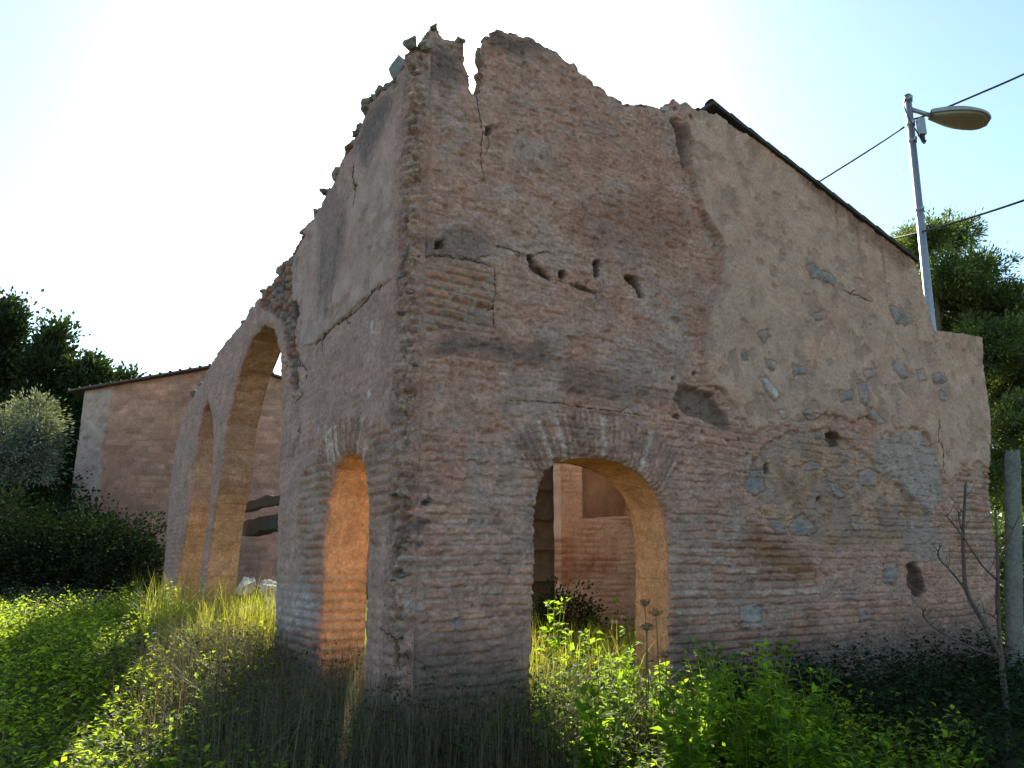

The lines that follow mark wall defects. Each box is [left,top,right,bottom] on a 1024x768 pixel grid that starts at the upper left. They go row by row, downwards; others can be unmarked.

crack [474,94,490,173]
crack [411,245,599,328]
spalling [526,254,601,295]
spalling [624,274,644,299]
crack [295,284,382,434]
crack [510,400,641,416]
spalling [824,431,841,448]